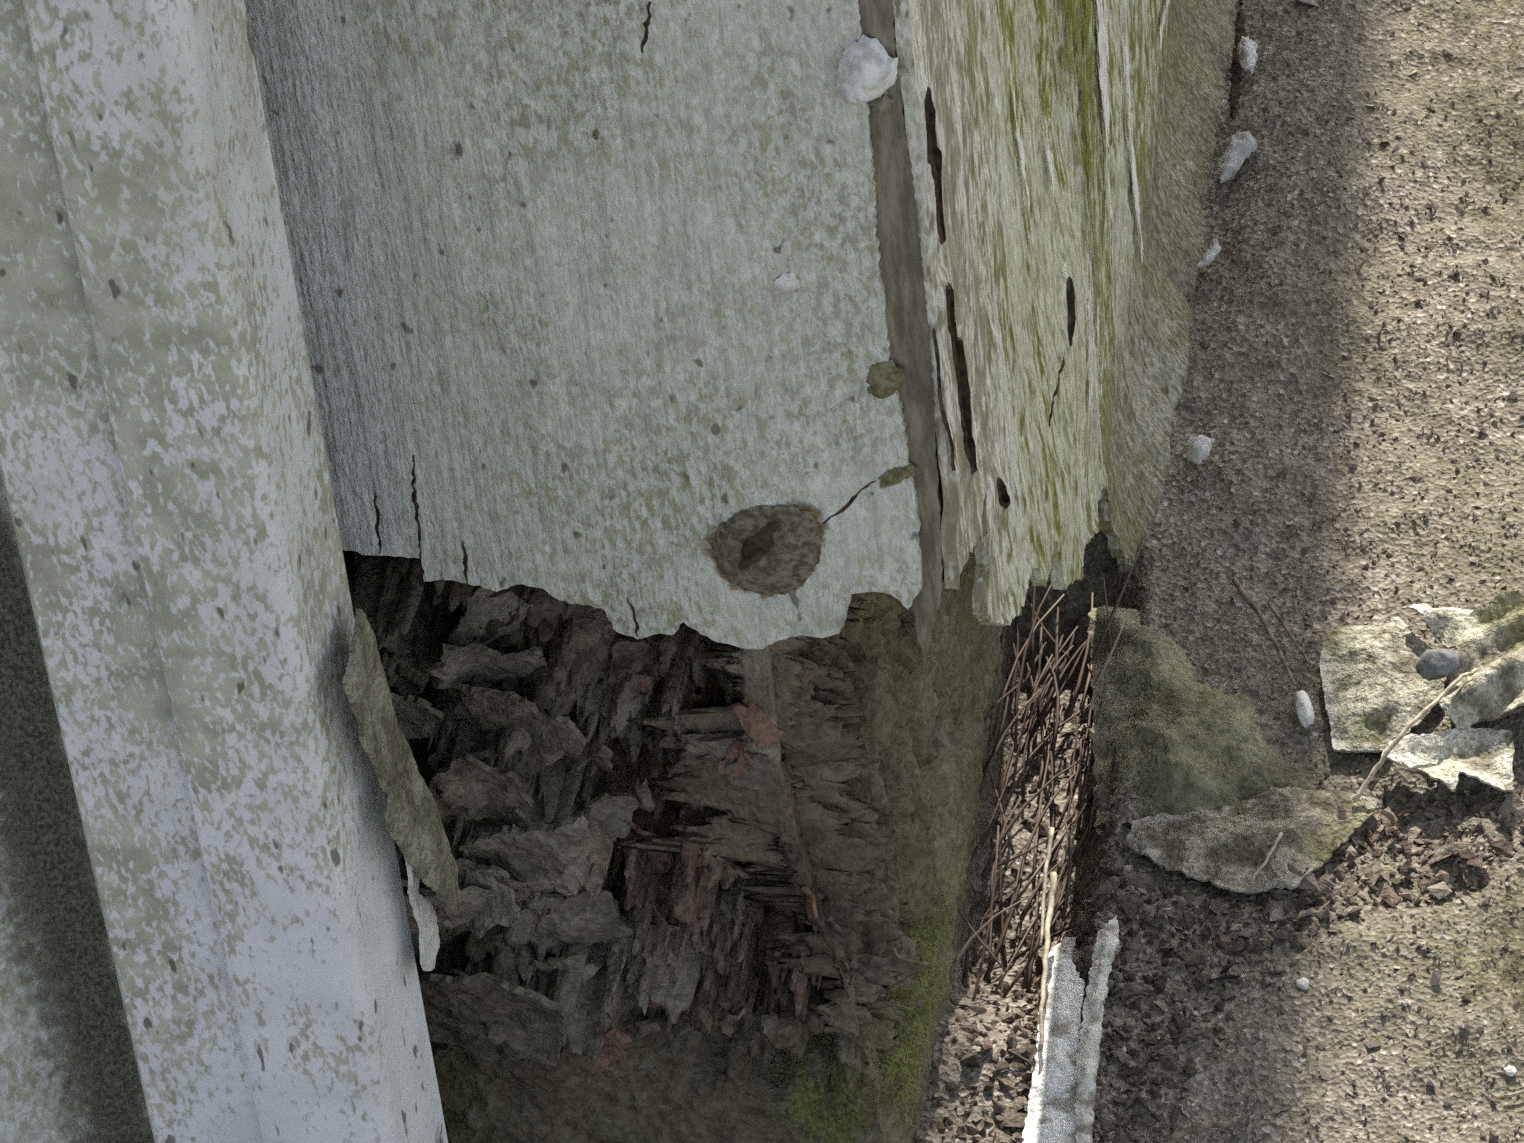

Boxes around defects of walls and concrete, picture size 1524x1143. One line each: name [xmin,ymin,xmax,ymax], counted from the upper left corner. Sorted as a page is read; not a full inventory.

crack [924,87,946,245]
leakage [987,0,1033,243]
leakage [1044,0,1143,275]
crack [932,282,978,475]
crack [1049,277,1076,427]
leakage [1088,298,1102,419]
spalling [704,503,827,599]
spalling [717,700,785,790]
spalling [343,586,674,1072]
spalling [789,885,856,972]
spalling [716,1005,779,1037]
leakage [769,901,953,1143]